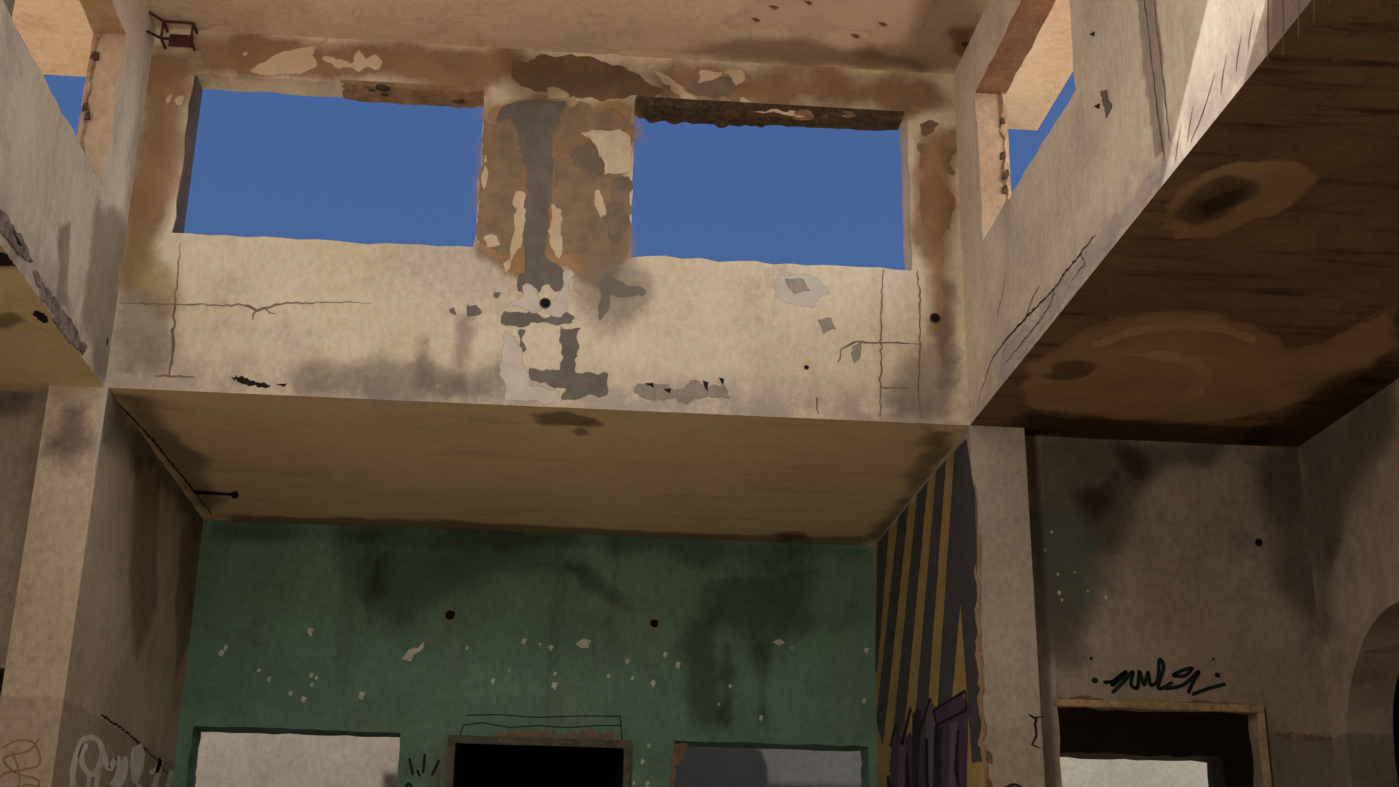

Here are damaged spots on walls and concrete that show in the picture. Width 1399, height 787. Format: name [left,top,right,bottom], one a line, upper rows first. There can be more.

spalling [76,32,102,151]
spalling [0,210,87,355]
crack [118,243,368,378]
peeling [340,54,905,405]
peeling [913,120,957,346]
damp [1000,108,1399,423]
crack [121,405,212,515]